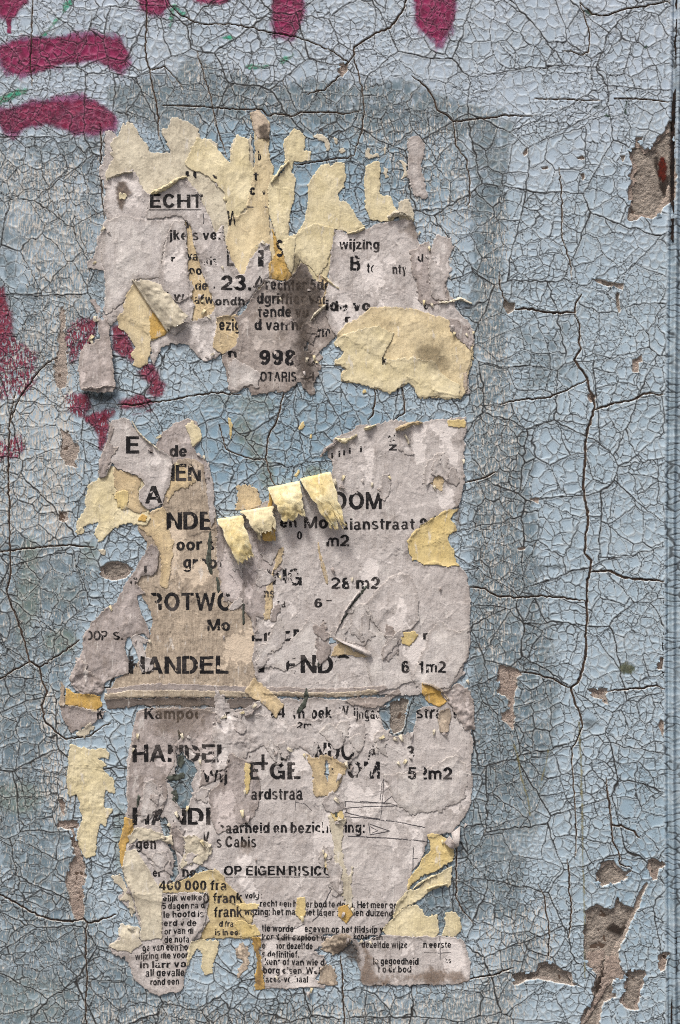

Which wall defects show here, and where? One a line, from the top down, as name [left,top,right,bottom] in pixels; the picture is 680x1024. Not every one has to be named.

crack [144,0,407,165]
crack [413,77,665,208]
crack [571,1,668,56]
spalling [621,121,677,221]
crack [119,392,240,406]
crack [219,393,284,485]
crack [0,358,109,740]
crack [471,172,664,960]
peeling [496,665,521,729]
crack [0,894,116,1024]
spalling [511,960,578,987]
spalling [580,858,665,1024]